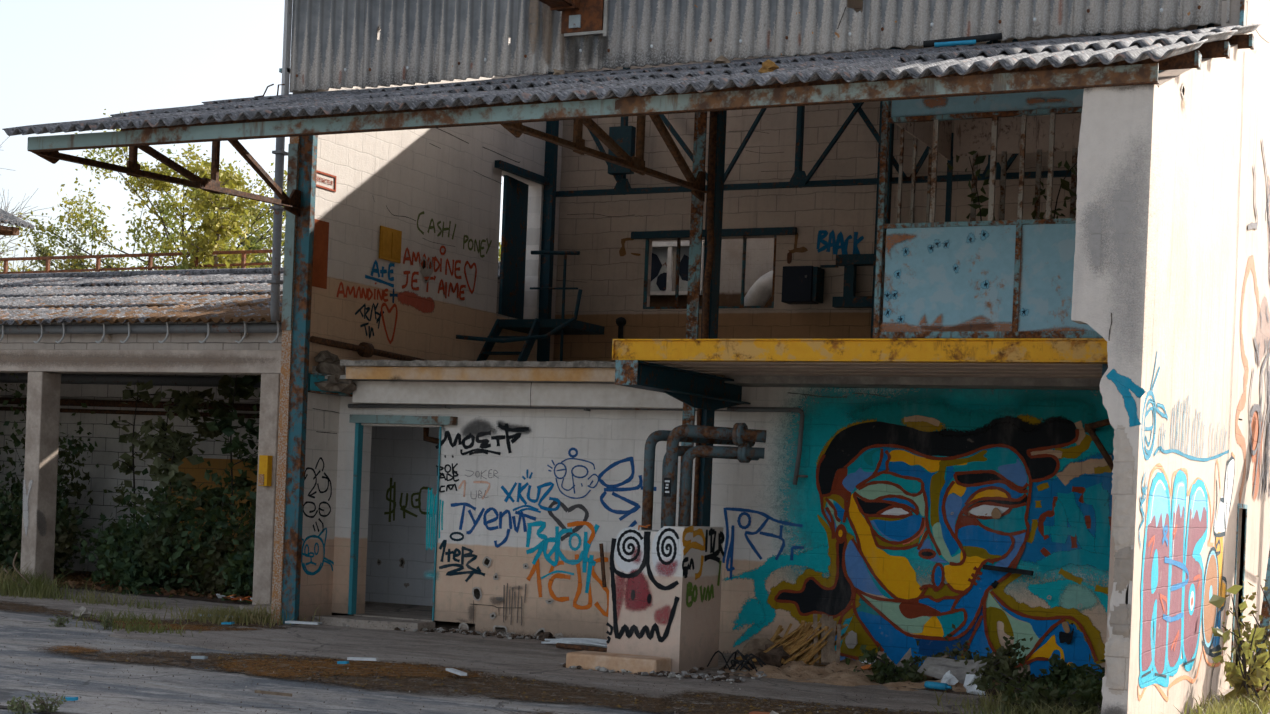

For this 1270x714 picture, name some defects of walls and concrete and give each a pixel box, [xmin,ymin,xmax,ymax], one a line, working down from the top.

corrosion [529,0,552,64]
corrosion [923,97,948,108]
corrosion [880,234,1022,332]
spalling [1104,424,1137,695]